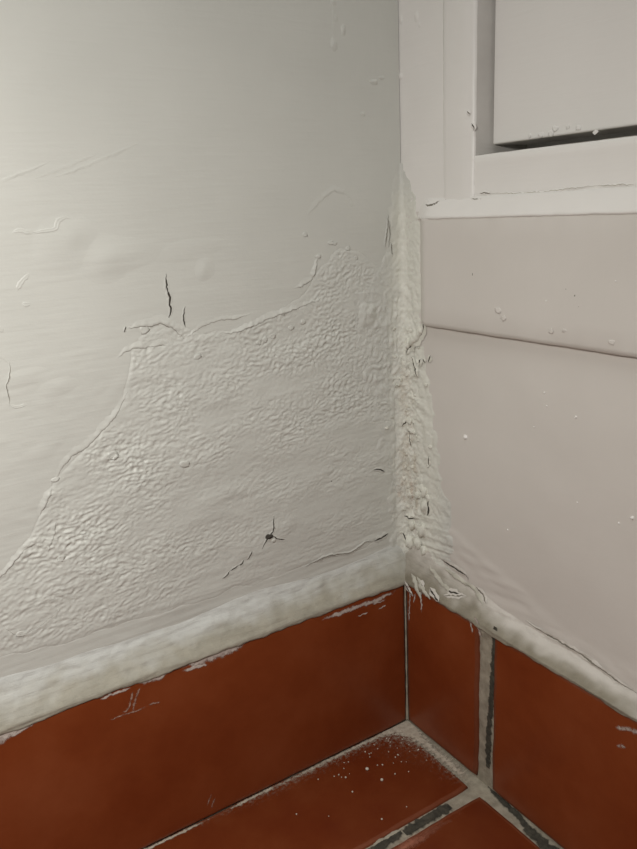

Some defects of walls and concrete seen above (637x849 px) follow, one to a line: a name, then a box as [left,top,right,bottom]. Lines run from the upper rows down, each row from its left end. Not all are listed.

crack [163,273,186,328]
crack [222,517,285,579]
leakage [485,626,497,768]
leakage [488,786,559,849]